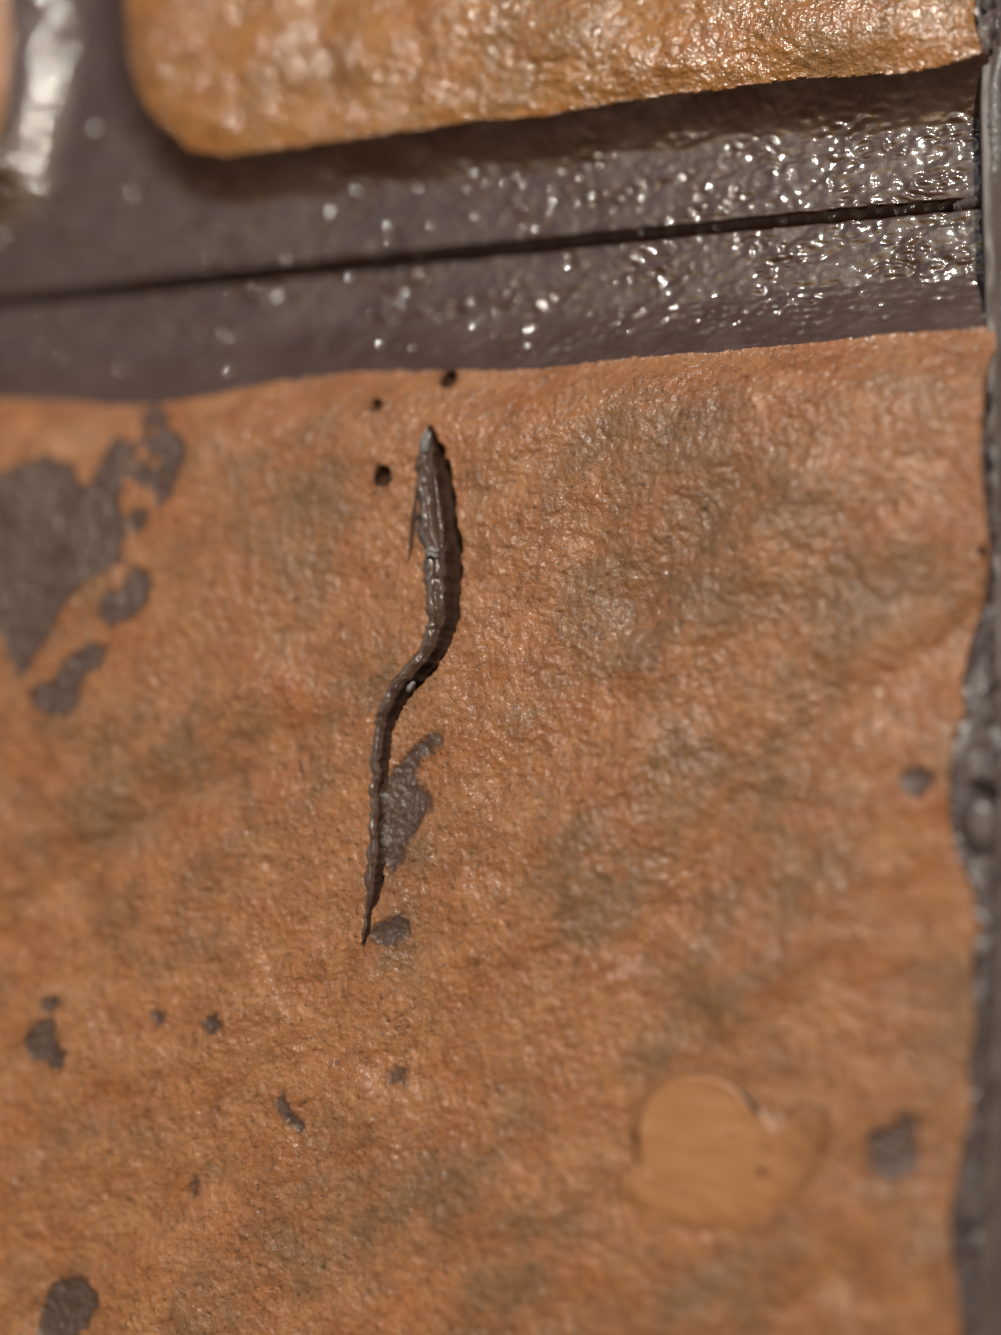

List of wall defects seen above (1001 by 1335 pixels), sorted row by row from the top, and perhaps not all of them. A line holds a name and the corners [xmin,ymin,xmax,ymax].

peeling [0,402,185,677]
peeling [30,642,106,717]
crack [361,428,465,949]
peeling [24,996,66,1069]
peeling [866,1112,919,1180]
peeling [37,1275,98,1335]